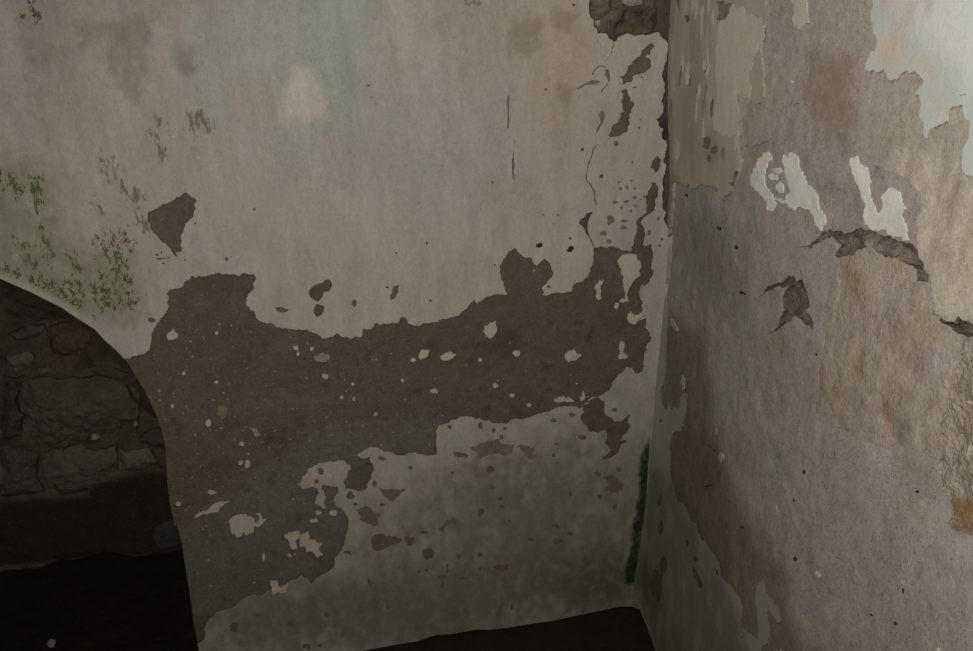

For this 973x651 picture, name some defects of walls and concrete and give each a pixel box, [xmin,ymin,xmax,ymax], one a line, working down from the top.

flaking render [589,0,658,147]
damp [0,169,92,274]
damp [92,231,134,270]
flaking render [651,156,661,173]
flaking render [658,0,973,651]
flaking render [125,182,658,643]